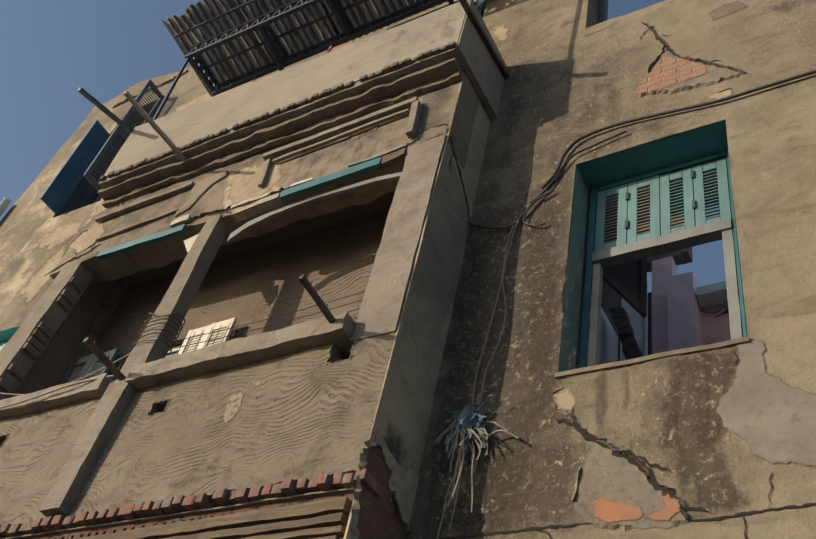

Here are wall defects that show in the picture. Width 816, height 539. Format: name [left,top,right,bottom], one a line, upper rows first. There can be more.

flaking render [709,1,747,20]
flaking render [175,80,253,112]
flaking render [631,45,745,100]
crack [640,21,747,74]
flaking render [418,123,450,141]
flaking render [17,191,150,306]
flaking render [552,387,576,415]
water stain [596,374,605,424]
flaking render [350,432,419,539]
flaking render [571,440,689,532]
crack [556,414,816,539]